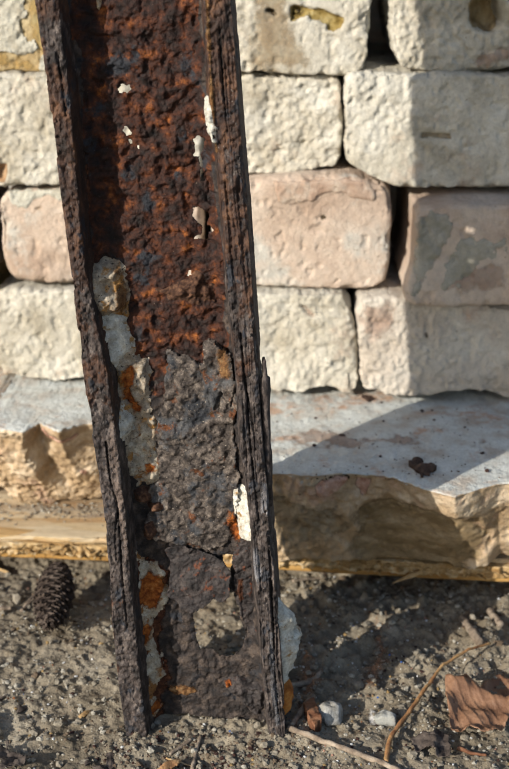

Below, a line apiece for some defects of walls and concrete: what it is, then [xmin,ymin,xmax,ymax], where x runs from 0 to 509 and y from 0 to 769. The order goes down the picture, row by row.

peeling [0,0,45,71]
rust [205,0,215,123]
spalling [290,5,344,31]
rust [114,263,128,313]
peeling [199,342,235,410]
rust [217,348,230,379]
rust [137,511,257,719]
rust [222,676,265,716]